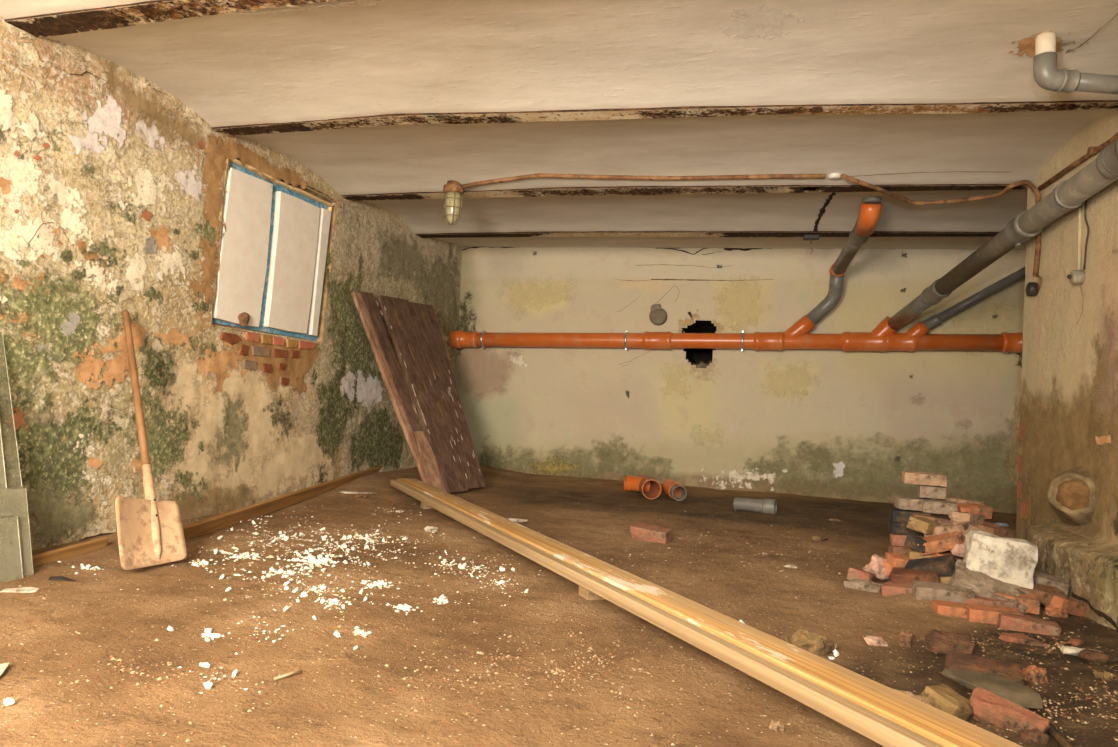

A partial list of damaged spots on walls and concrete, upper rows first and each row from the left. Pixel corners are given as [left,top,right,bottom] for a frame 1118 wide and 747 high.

rust [6,0,340,38]
rust [213,114,522,136]
rust [634,103,1118,119]
leakage [144,285,164,305]
flaking render [0,85,337,513]
spalling [678,310,724,333]
spalling [683,348,716,368]
leakage [263,396,292,439]
leakage [1009,318,1118,540]
leakage [700,458,788,491]
leakage [833,462,845,478]
leakage [175,485,254,520]